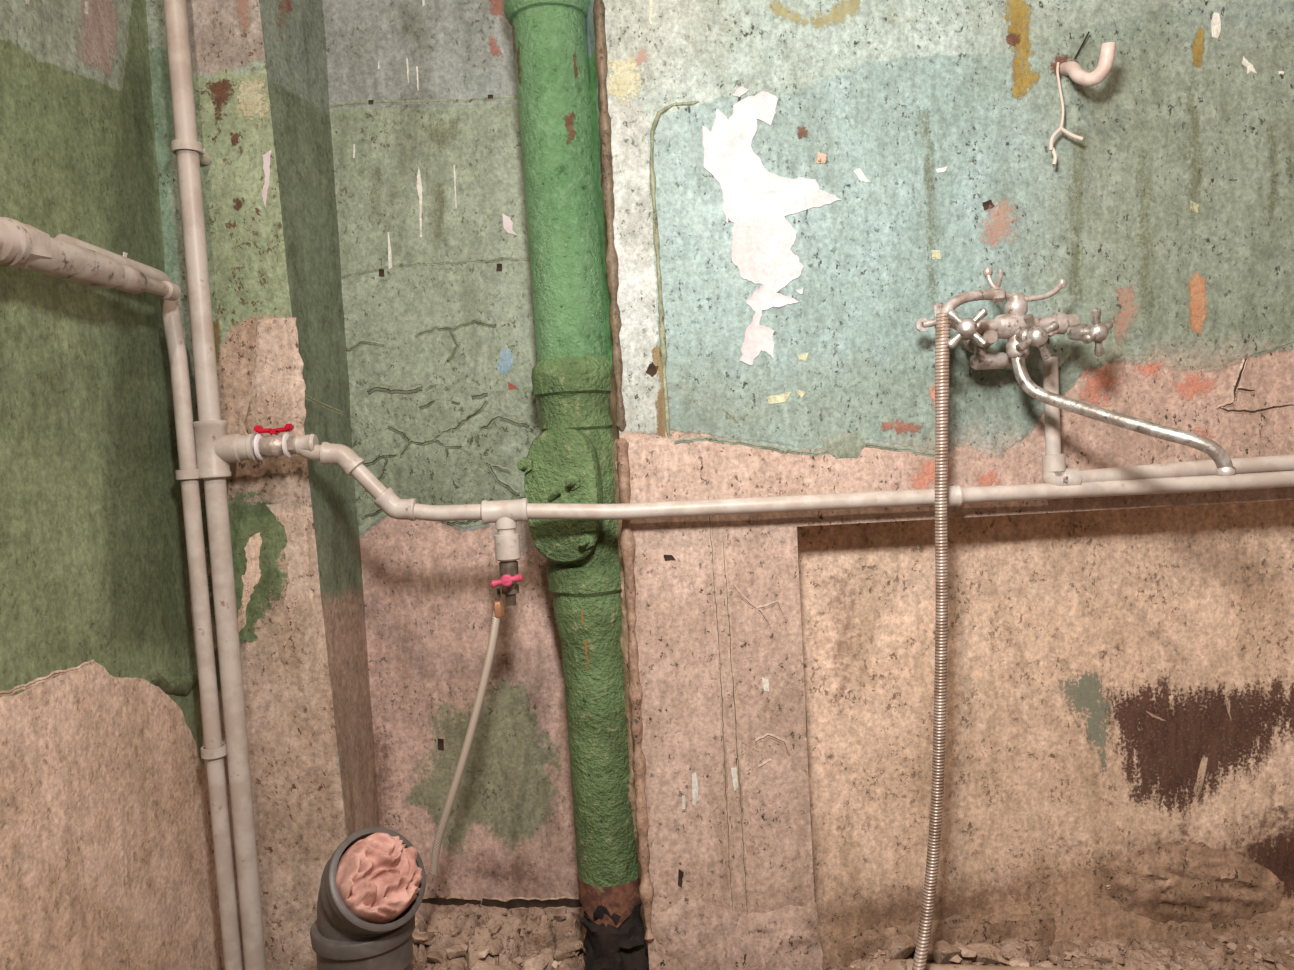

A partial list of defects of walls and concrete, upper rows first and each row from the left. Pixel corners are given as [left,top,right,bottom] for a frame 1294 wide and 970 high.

peeling [702,86,842,365]
crack [346,340,384,352]
crack [415,318,496,393]
peeling [646,362,658,377]
peeling [766,390,806,404]
peeling [674,432,935,458]
peeling [238,532,262,632]
peeling [266,498,320,696]
leakage [1105,677,1294,844]
peeling [0,659,221,970]
spalling [1101,842,1294,924]
leakage [1223,812,1294,898]